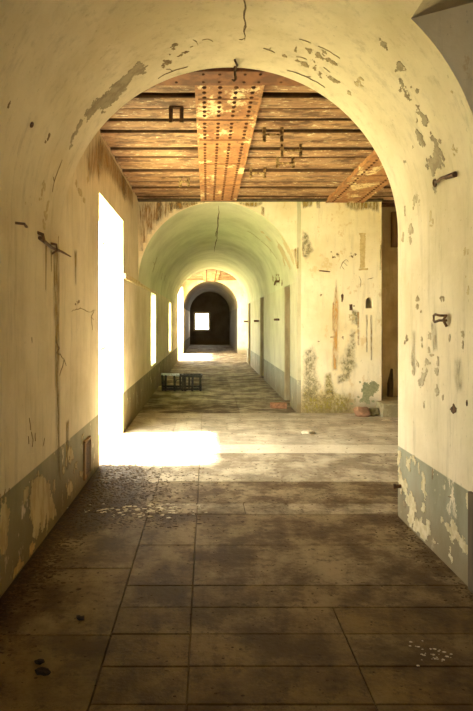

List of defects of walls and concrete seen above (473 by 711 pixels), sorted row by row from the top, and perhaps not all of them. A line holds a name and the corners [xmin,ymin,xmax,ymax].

crack [239,0,247,40]
spalling [282,47,341,84]
peeling [69,61,148,150]
peeling [395,61,458,193]
damp [88,141,133,202]
damp [45,246,59,406]
crack [28,236,94,473]
damp [305,350,317,395]
damp [326,340,354,392]
peeling [349,381,379,405]
peeling [397,450,438,544]
peeling [441,517,468,564]